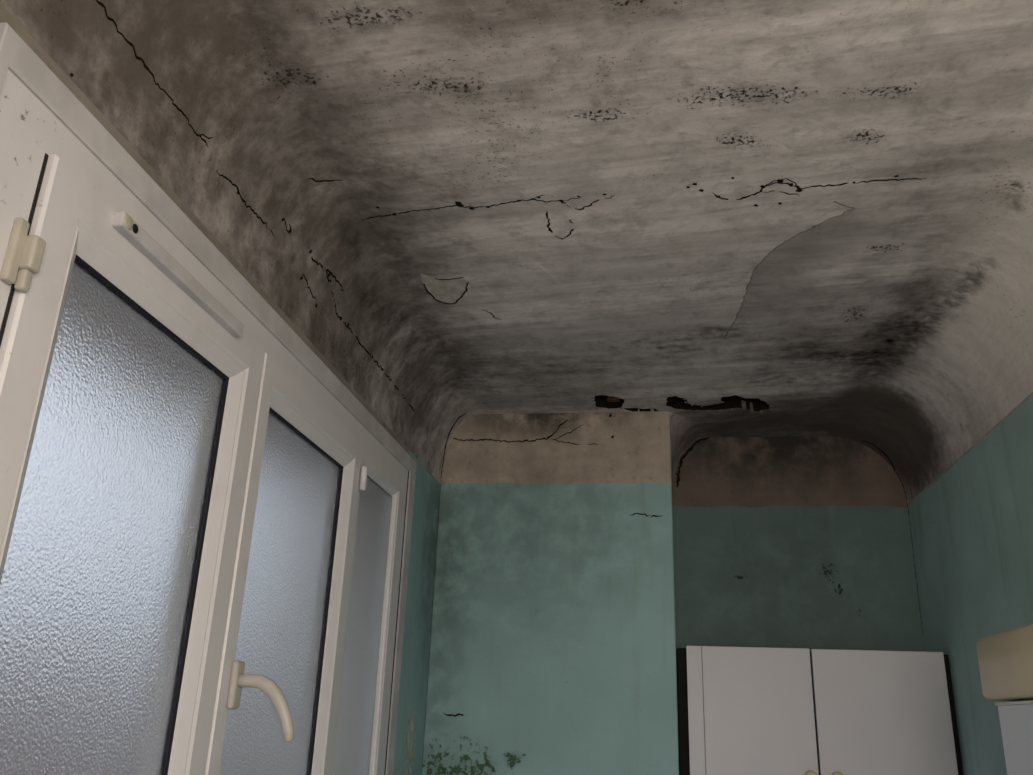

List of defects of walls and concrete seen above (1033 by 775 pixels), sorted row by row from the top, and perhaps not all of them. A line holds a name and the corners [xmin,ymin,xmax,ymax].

damp [320,7,421,32]
crack [96,0,213,146]
damp [413,79,485,96]
damp [679,85,818,109]
damp [562,108,625,122]
crack [687,175,927,207]
crack [363,194,614,240]
crack [218,173,415,412]
spalling [591,394,773,412]
damp [402,718,495,775]